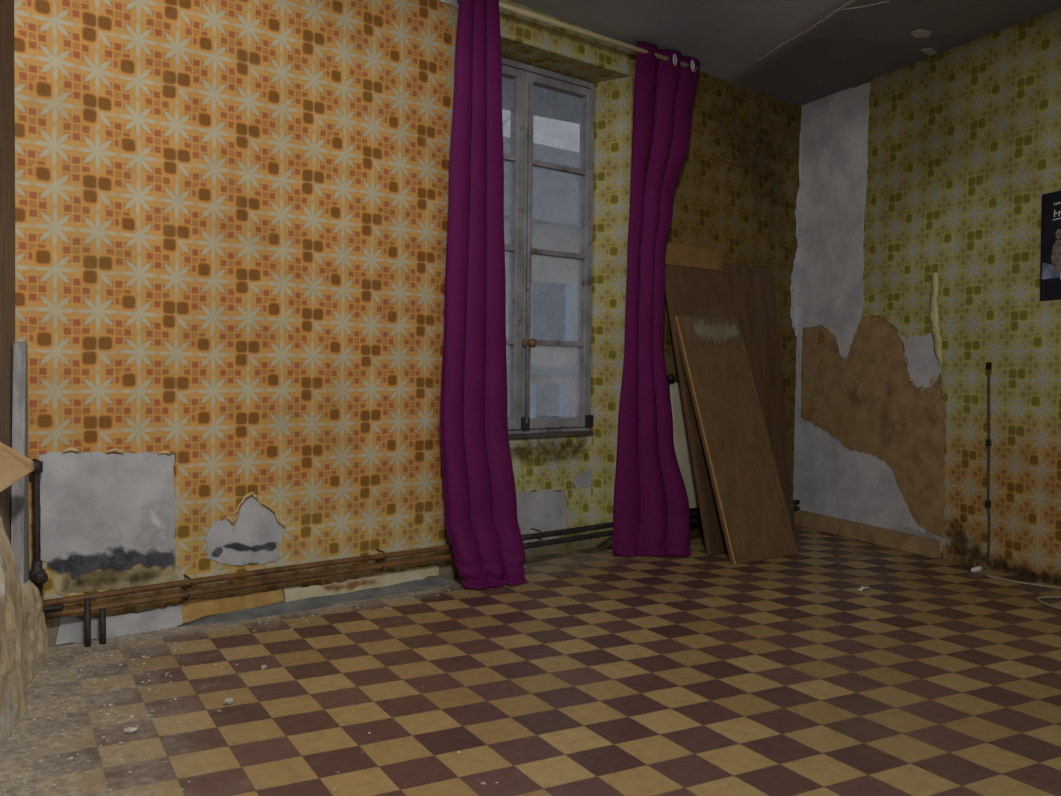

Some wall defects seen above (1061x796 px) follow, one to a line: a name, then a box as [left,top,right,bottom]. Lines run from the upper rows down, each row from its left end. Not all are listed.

peeling [790,83,947,551]
peeling [38,447,177,563]
water stain [48,547,179,595]
peeling [205,492,286,566]